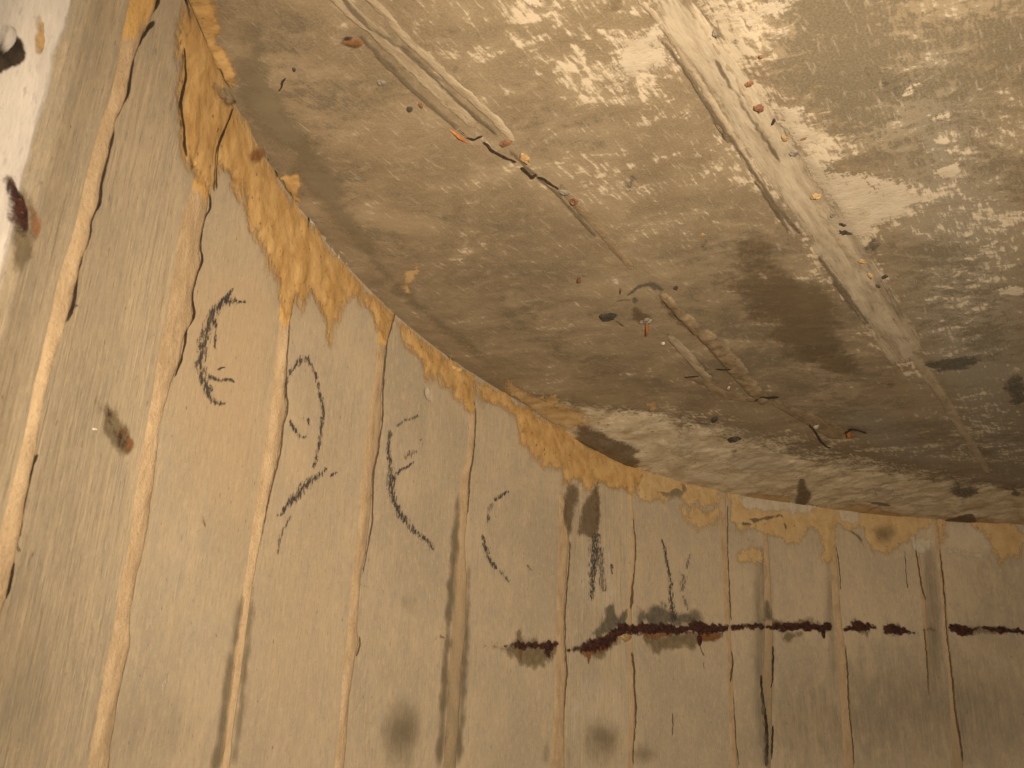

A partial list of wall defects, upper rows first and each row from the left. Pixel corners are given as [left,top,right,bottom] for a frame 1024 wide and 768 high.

crack [67,0,160,321]
crack [459,130,559,190]
crack [175,100,237,376]
water stain [564,485,600,537]
water stain [446,528,457,620]
water stain [440,635,449,710]
corrosion [504,605,928,667]
crack [760,647,774,765]
crack [905,549,963,760]
corrosion [948,623,1024,636]